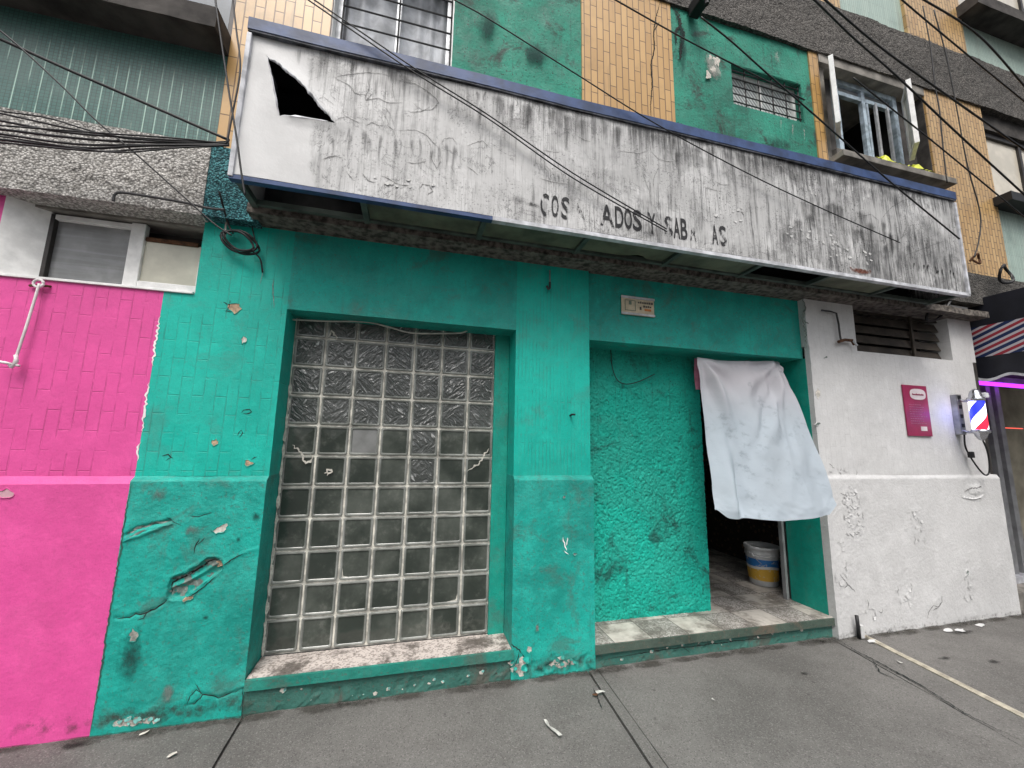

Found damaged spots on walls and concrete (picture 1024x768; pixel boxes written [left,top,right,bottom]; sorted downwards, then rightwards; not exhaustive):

crack [650,1,685,110]
peeling [706,55,720,79]
flaking render [122,519,172,542]
spalling [211,523,228,534]
crack [118,554,242,620]
flaking render [166,557,224,603]
peeling [508,646,532,677]
peeling [549,656,576,668]
crack [187,685,243,710]
peeling [113,716,160,727]